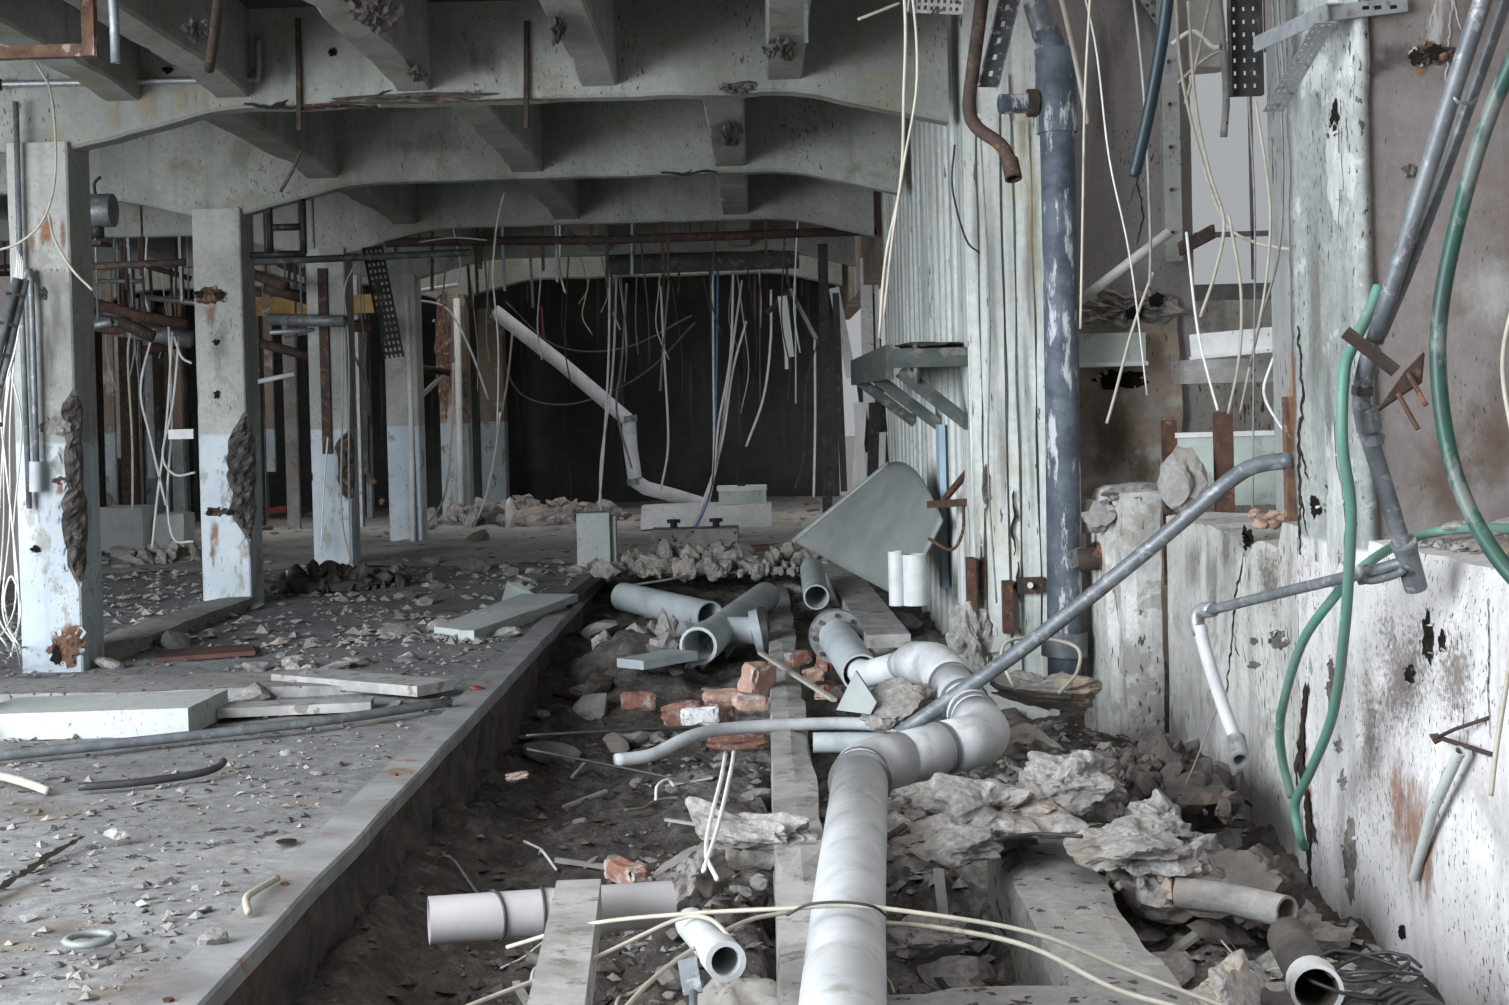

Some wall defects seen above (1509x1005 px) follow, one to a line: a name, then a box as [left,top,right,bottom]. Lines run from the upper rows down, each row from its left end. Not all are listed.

spalling [347,0,404,36]
spalling [1408,39,1455,74]
spalling [39,396,88,581]
spalling [204,417,257,541]
spalling [317,268,355,503]
crack [1297,325,1308,555]